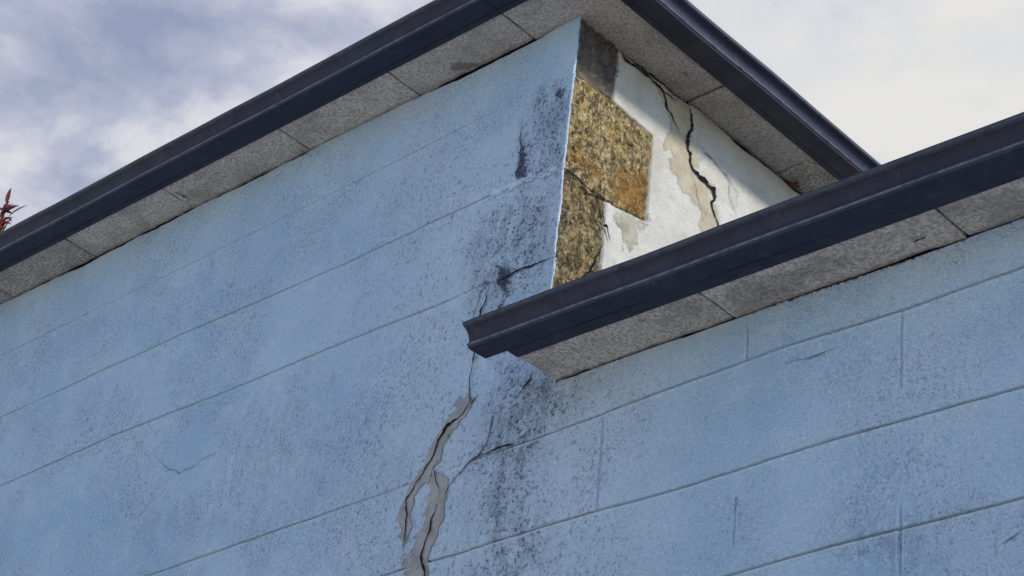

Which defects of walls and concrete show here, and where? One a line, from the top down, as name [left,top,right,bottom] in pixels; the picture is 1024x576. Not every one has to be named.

leakage [456,172,557,326]
crack [473,258,550,318]
crack [565,169,610,277]
crack [616,51,737,226]
flaking render [658,84,719,232]
flaking render [396,394,472,576]
crack [402,352,520,576]